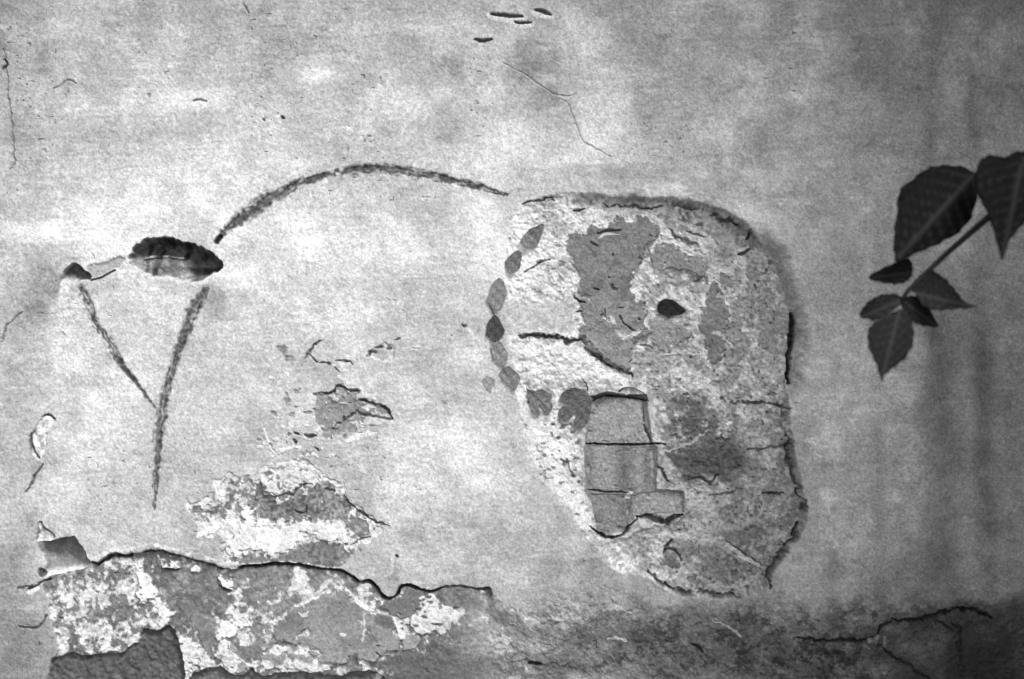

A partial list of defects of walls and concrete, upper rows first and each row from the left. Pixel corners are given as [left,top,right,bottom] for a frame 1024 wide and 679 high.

flaking render [473,37,494,45]
flaking render [490,8,553,26]
crack [502,62,614,159]
spalling [60,235,225,299]
flaking render [501,191,811,603]
flaking render [24,413,58,494]
peeling [36,336,512,679]
crack [794,604,995,679]